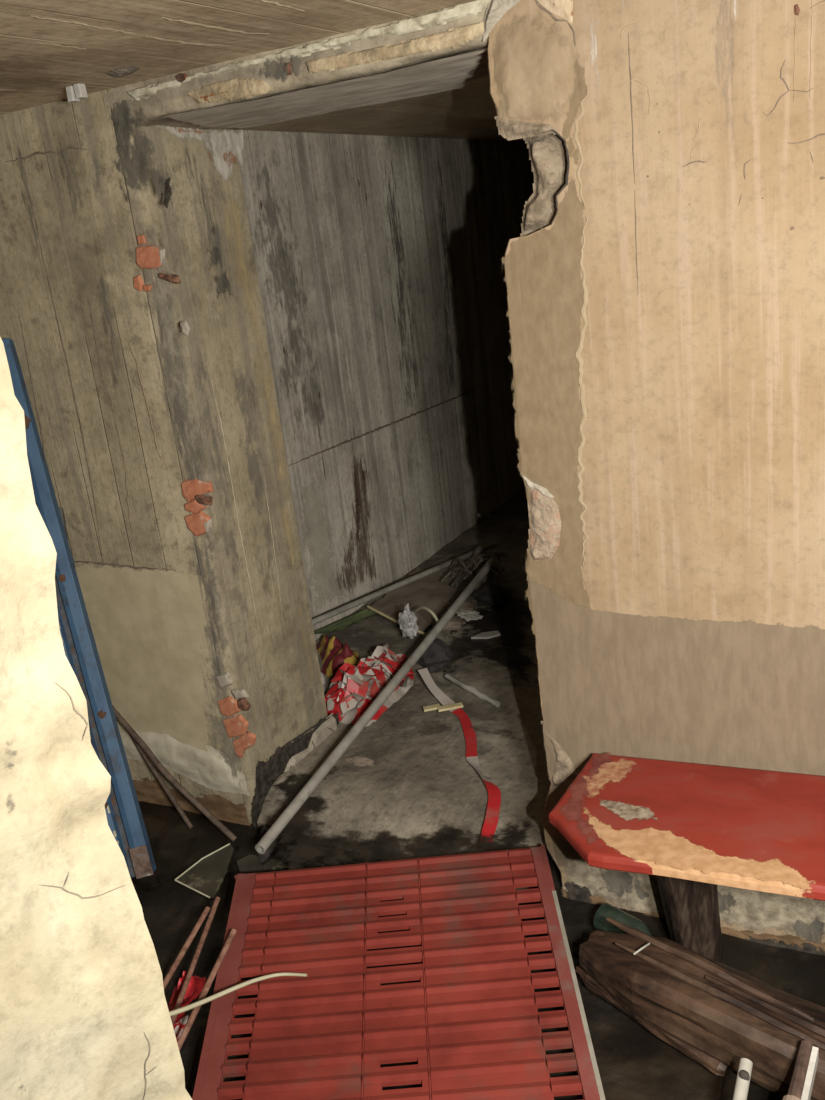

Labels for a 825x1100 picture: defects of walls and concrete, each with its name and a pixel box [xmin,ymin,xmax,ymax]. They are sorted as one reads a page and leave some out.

leakage [162,49,484,128]
leakage [111,100,174,208]
crack [791,133,825,161]
peeling [495,60,590,635]
leakage [133,714,530,870]
spalling [541,721,578,786]
leakage [443,578,825,867]
leakage [561,882,611,905]
leakage [721,927,825,956]